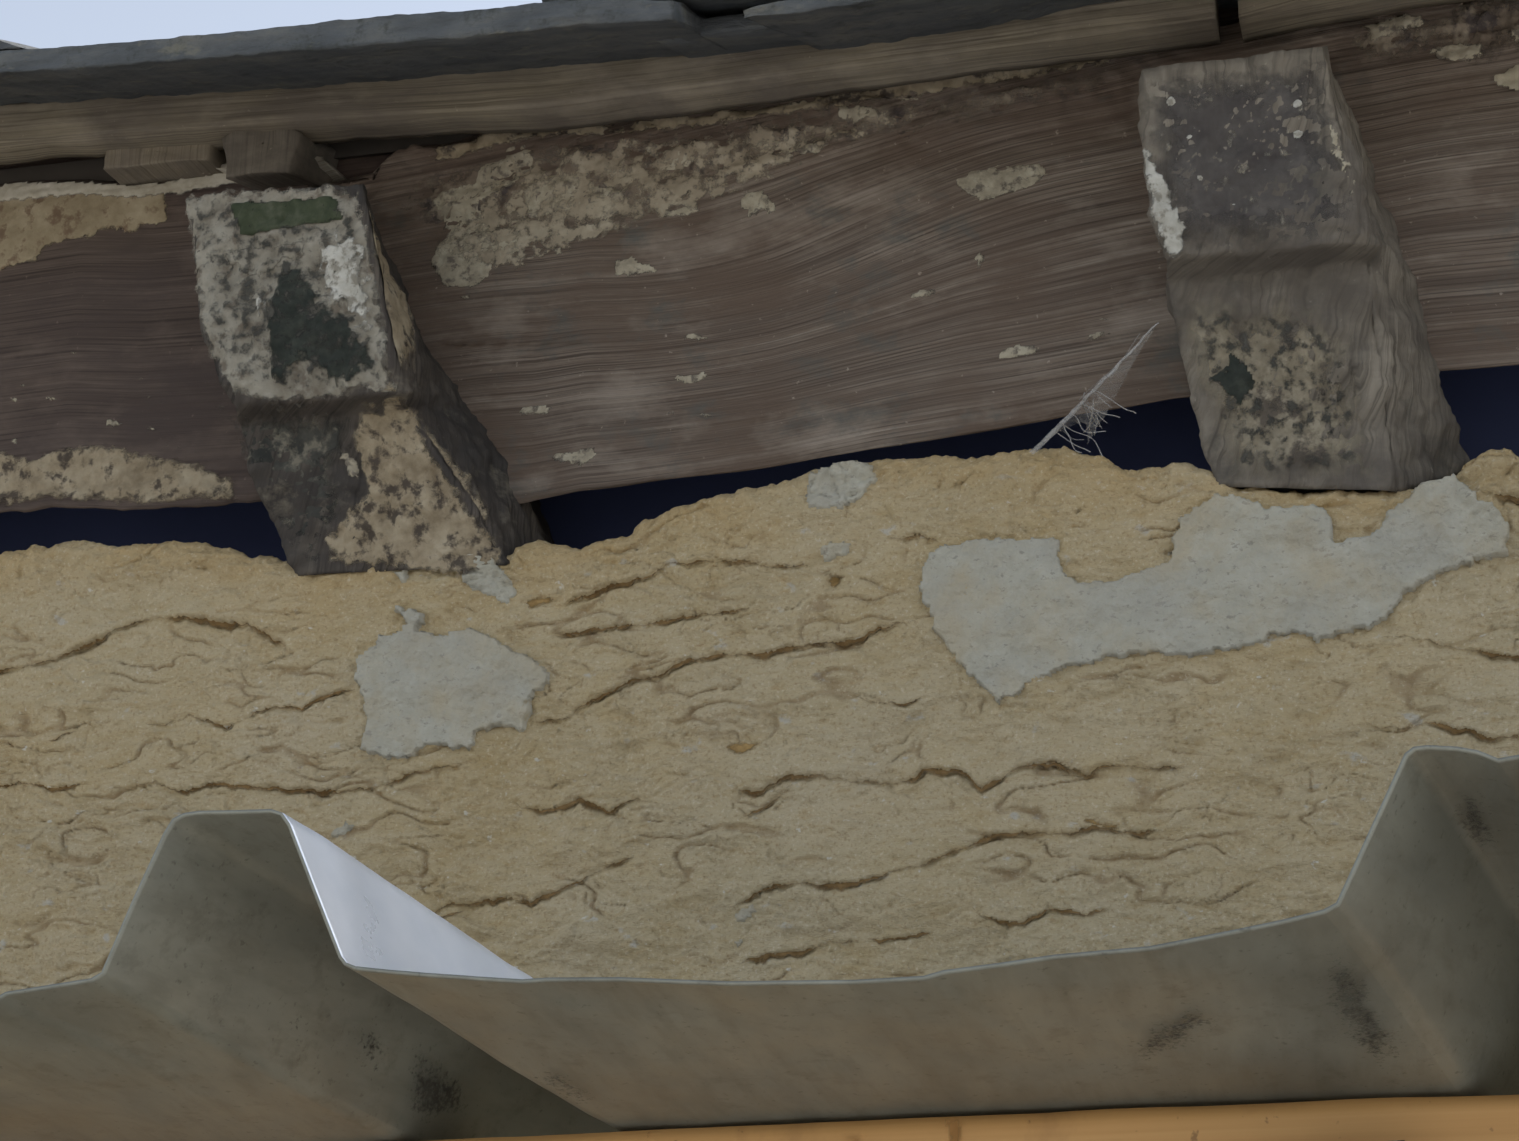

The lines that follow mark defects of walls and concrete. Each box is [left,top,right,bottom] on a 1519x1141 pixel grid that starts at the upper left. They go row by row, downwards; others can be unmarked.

damp [195,197,379,386]
damp [1198,312,1356,470]
damp [242,416,341,550]
crack [564,559,800,637]
crack [0,615,281,673]
crack [543,627,889,722]
crack [1429,722,1518,742]
crack [173,766,444,797]
crack [535,798,633,814]
crack [908,762,1114,792]
crack [744,874,885,902]
crack [748,948,815,964]